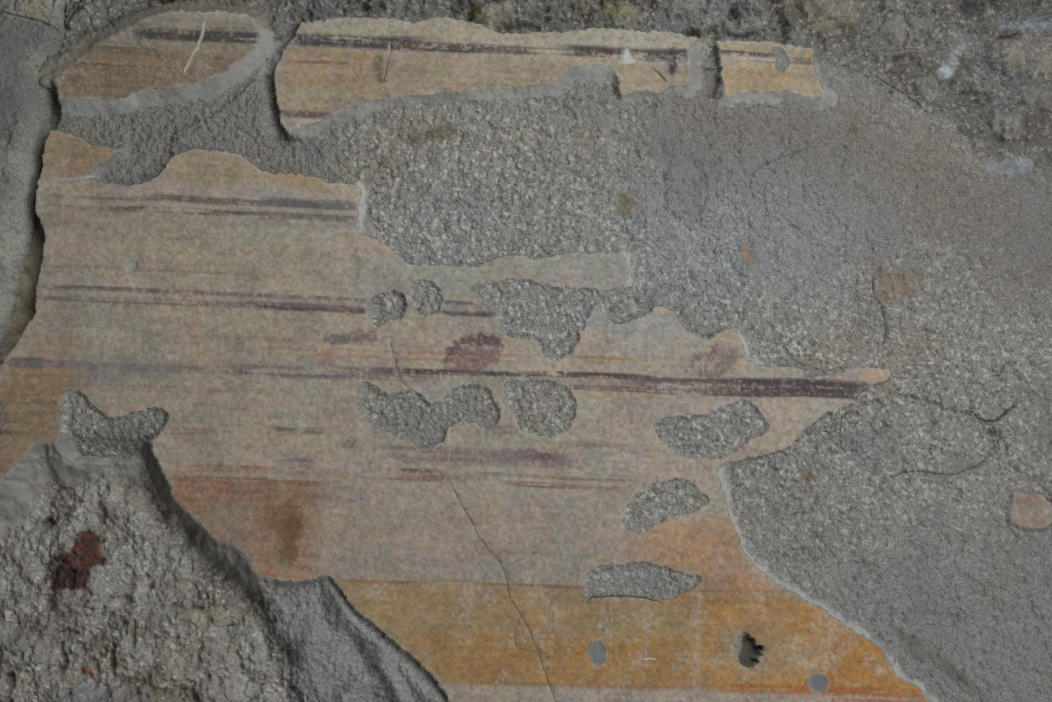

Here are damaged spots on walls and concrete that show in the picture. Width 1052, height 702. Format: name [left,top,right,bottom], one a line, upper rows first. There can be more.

flaking render [55,17,311,186]
flaking render [288,38,1052,702]
spalling [0,390,448,702]
crack [448,481,555,699]